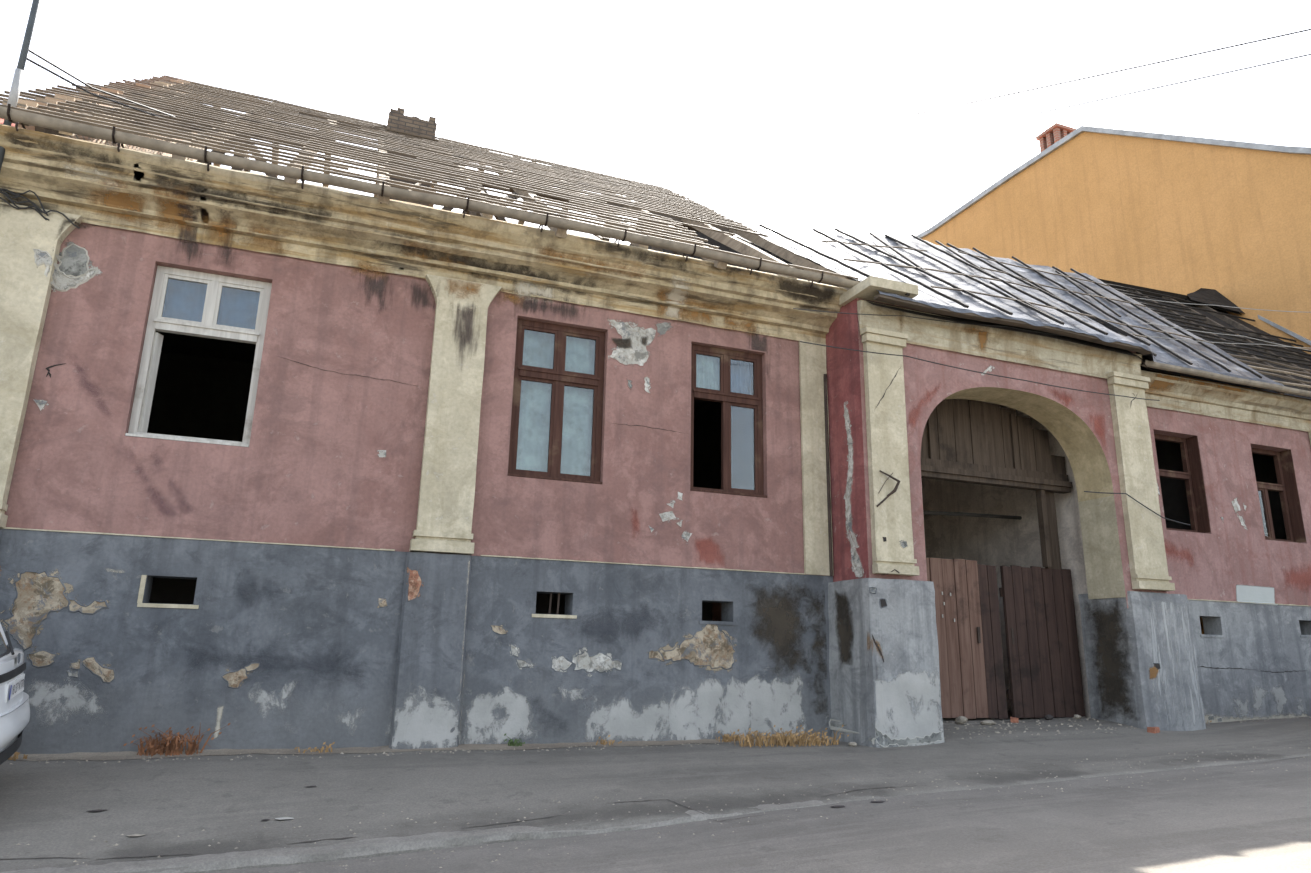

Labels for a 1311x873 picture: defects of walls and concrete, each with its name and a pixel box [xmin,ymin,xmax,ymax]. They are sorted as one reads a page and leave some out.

water stain [157,173,330,263]
flaking render [33,240,103,294]
water stain [393,235,594,316]
water stain [599,243,688,317]
peeling [607,318,674,394]
flaking render [648,491,692,544]
flaking render [0,569,116,683]
water stain [29,678,101,724]
water stain [388,687,537,749]
flaking render [551,647,623,677]
flaking render [648,624,737,673]
water stain [562,587,853,741]